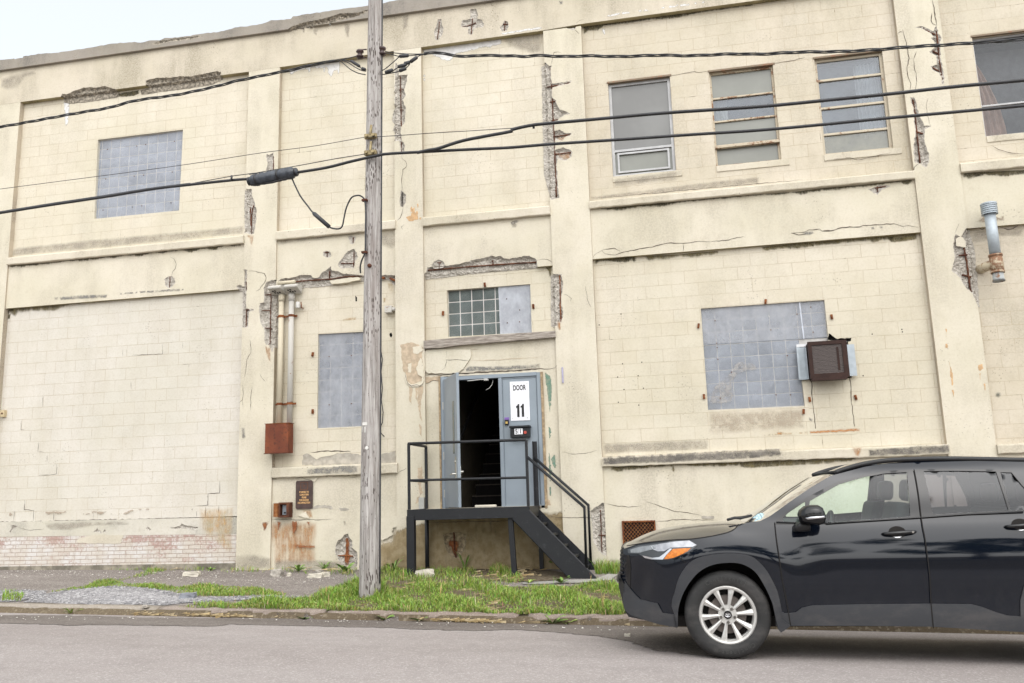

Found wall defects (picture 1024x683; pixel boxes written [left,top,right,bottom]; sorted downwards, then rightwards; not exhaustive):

spalling [61,86,119,104]
spalling [140,71,223,95]
spalling [392,62,407,156]
spalling [541,63,573,200]
spalling [910,97,931,167]
spalling [237,236,364,352]
spalling [424,256,538,279]
crack [601,237,739,255]
crack [793,223,914,235]
spalling [952,228,980,307]
rust [263,515,315,559]
peeling [381,515,559,570]